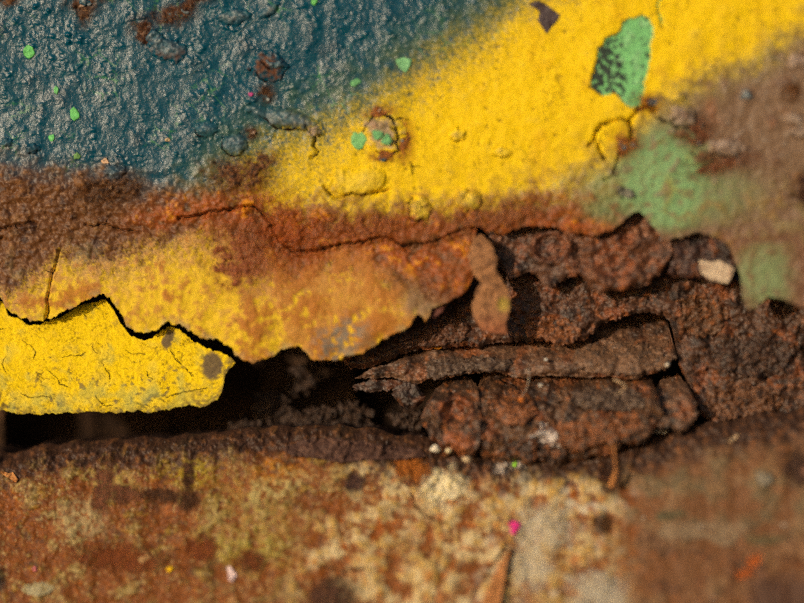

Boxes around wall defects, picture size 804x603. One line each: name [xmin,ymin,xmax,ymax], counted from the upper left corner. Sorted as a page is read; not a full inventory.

crack [589,104,655,179]
corrosion [212,153,276,191]
corrosion [212,207,310,289]
crack [179,206,474,254]
peeling [699,260,735,284]
peeling [428,305,446,319]
corrosion [423,354,514,380]
peeling [352,379,426,410]
corrosion [504,316,671,464]
corrosion [703,376,804,421]
peeling [281,437,428,463]
corrosion [91,462,198,511]